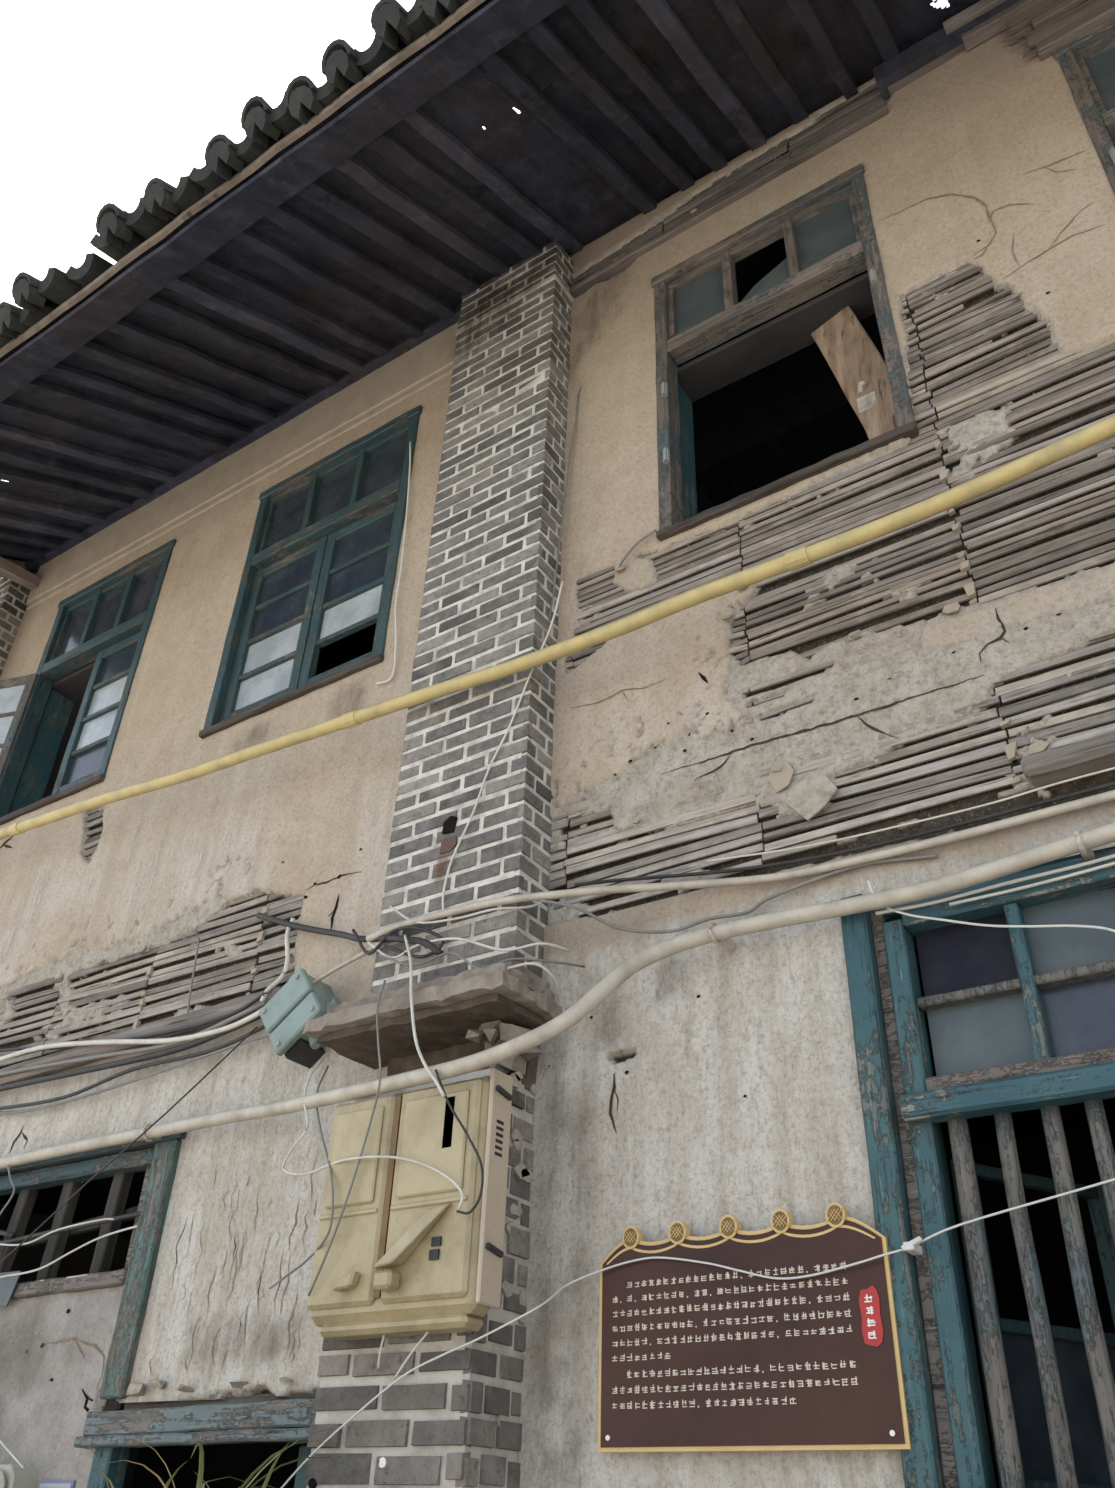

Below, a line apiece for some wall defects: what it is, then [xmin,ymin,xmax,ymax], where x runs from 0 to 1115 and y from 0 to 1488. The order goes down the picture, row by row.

crack [881,150,1106,279]
flaking render [544,240,1115,936]
crack [573,680,663,708]
crack [661,608,1010,779]
flaking render [75,804,110,869]
flaking render [0,861,316,1069]
spalling [465,1020,550,1075]
crack [609,1073,619,1133]
flaking render [83,1363,321,1425]